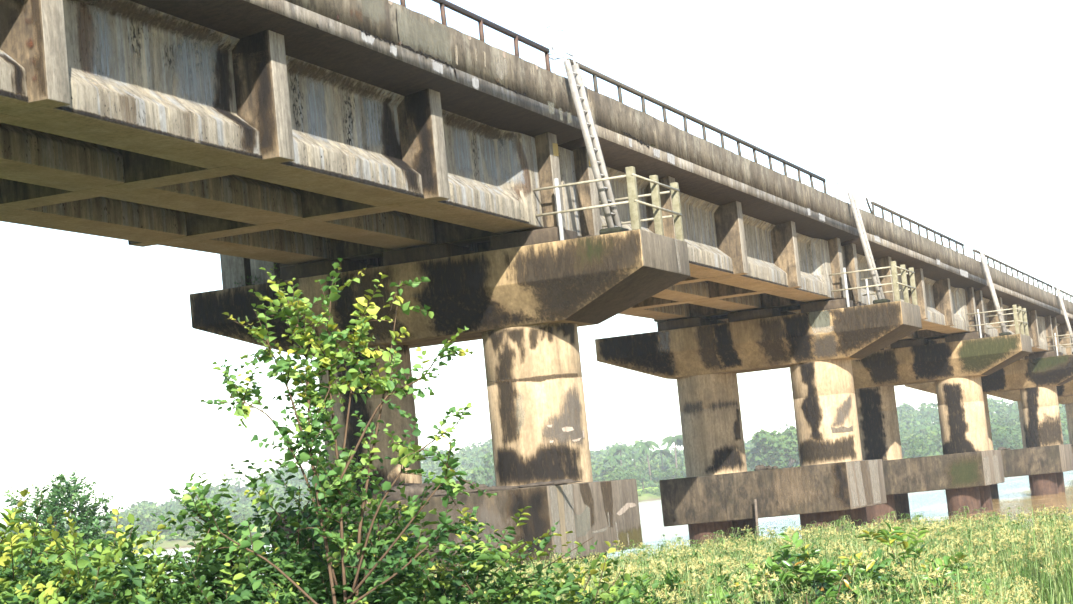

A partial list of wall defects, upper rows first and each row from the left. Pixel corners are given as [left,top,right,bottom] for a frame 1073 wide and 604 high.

damp [0,0,46,102]
damp [56,0,276,159]
damp [282,59,529,224]
damp [674,238,828,297]
damp [414,230,642,564]
damp [599,331,677,376]
damp [684,400,737,413]
damp [697,322,741,369]
damp [705,446,744,473]
damp [757,302,901,509]
damp [910,342,1001,485]